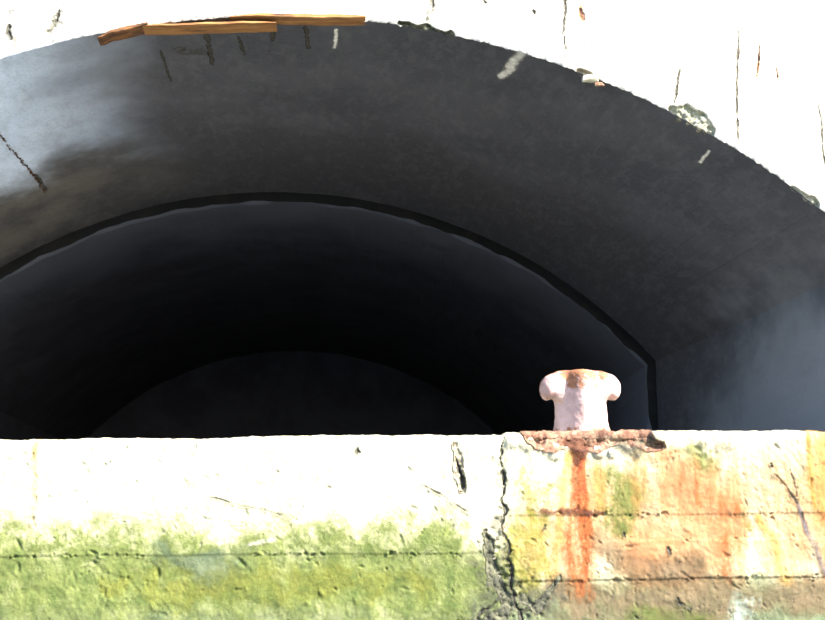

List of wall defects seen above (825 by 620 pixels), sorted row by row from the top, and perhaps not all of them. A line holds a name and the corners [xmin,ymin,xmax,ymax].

crack [736,30,760,143]
spalling [668,104,715,136]
crack [817,100,825,163]
crack [0,135,46,192]
corrosion [542,450,601,540]
crack [476,445,555,620]
leakage [512,583,825,620]
corrosion [660,563,696,578]